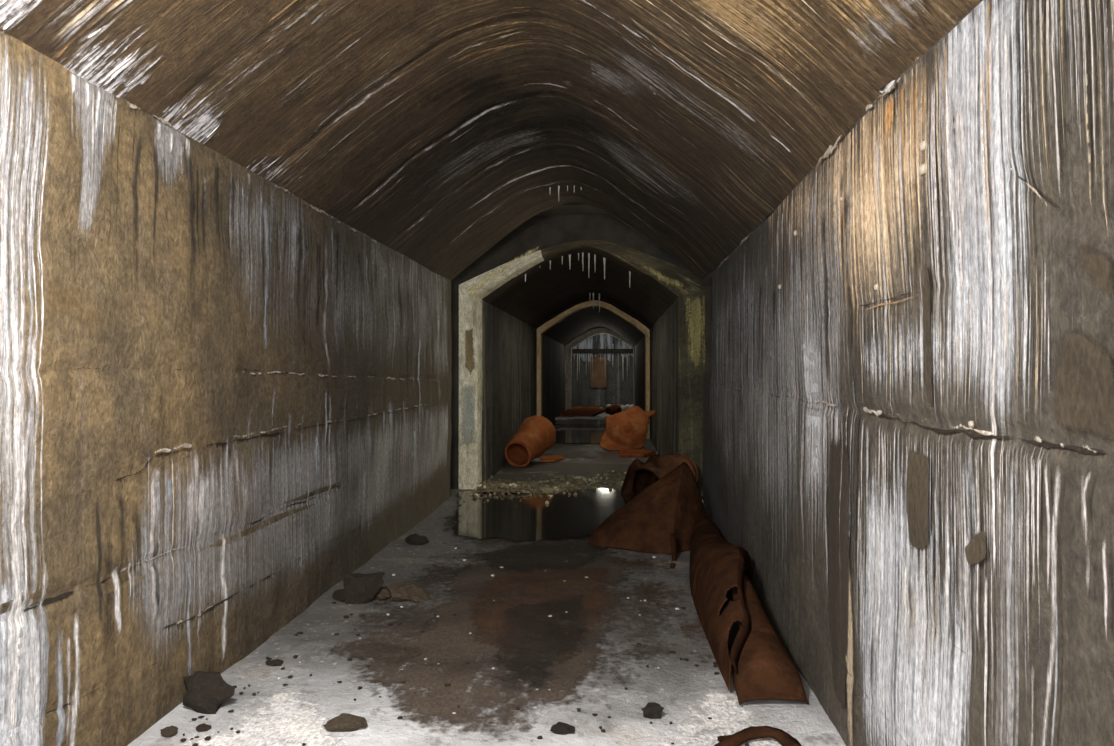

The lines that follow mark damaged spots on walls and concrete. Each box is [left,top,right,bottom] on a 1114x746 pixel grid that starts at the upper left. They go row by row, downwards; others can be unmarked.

leakage [0,0,41,30]
leakage [60,0,159,228]
leakage [0,45,79,746]
leakage [96,87,448,676]
leakage [461,329,475,445]
crack [719,387,1103,453]
crack [0,494,324,620]
leakage [331,535,674,737]